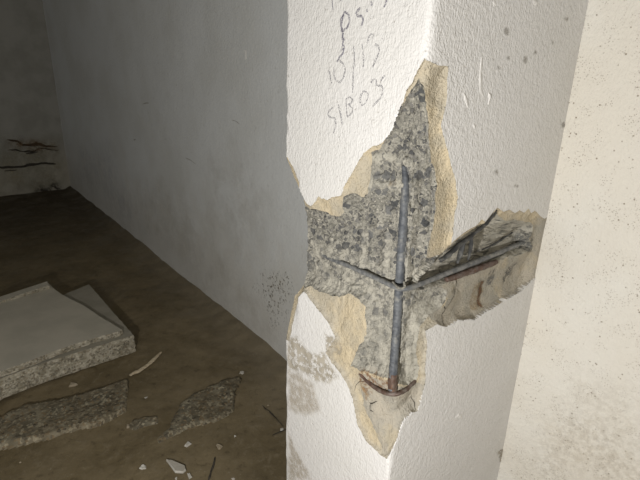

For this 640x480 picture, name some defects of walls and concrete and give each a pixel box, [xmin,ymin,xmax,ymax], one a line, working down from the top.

crack [0,139,57,171]
spalling [286,59,547,459]
rust [444,259,498,282]
rust [359,371,417,397]